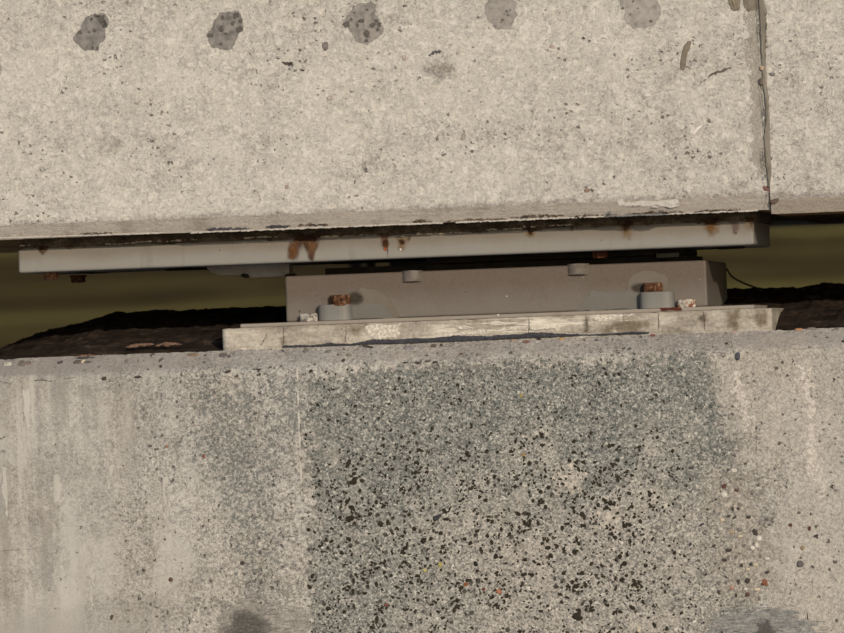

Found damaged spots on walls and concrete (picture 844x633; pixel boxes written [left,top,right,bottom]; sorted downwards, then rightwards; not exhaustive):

corrosion [288,235,320,261]